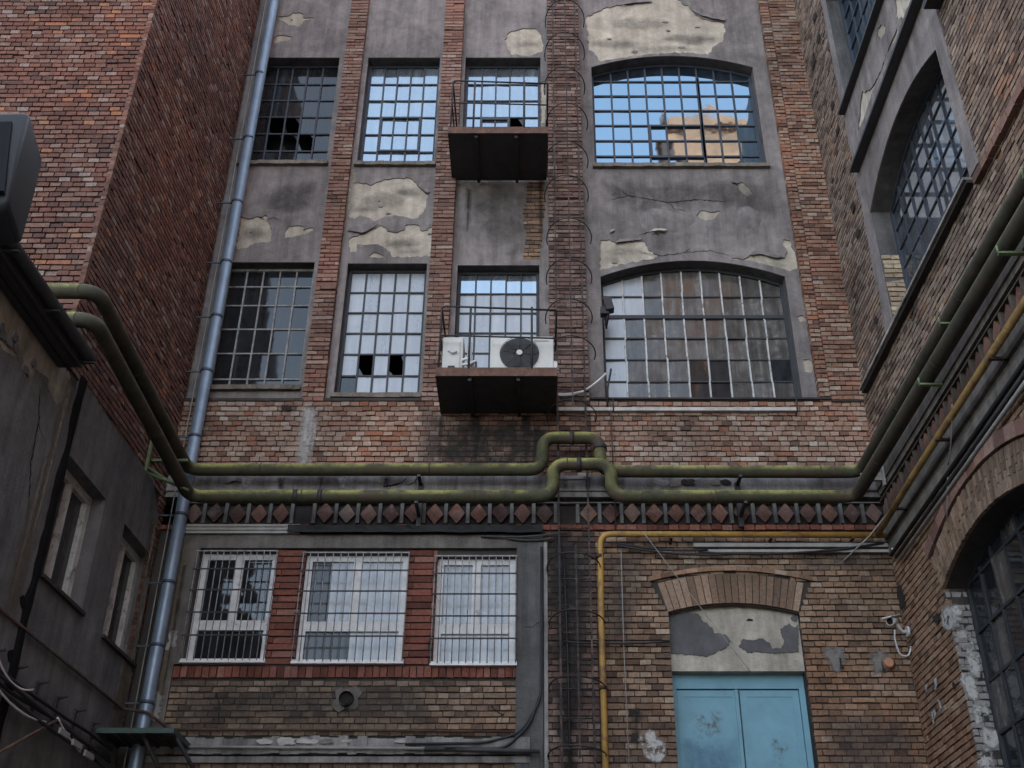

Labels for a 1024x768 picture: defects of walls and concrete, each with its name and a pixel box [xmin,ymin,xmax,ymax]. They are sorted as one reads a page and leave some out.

peeling [274,13,314,43]
peeling [505,29,543,56]
peeling [585,0,726,61]
peeling [859,0,910,127]
peeling [236,216,272,249]
peeling [285,226,313,238]
peeling [347,178,432,258]
peeling [523,181,545,260]
peeling [599,228,667,270]
crack [615,188,725,211]
peeling [668,612,799,657]
spalling [932,605,999,768]